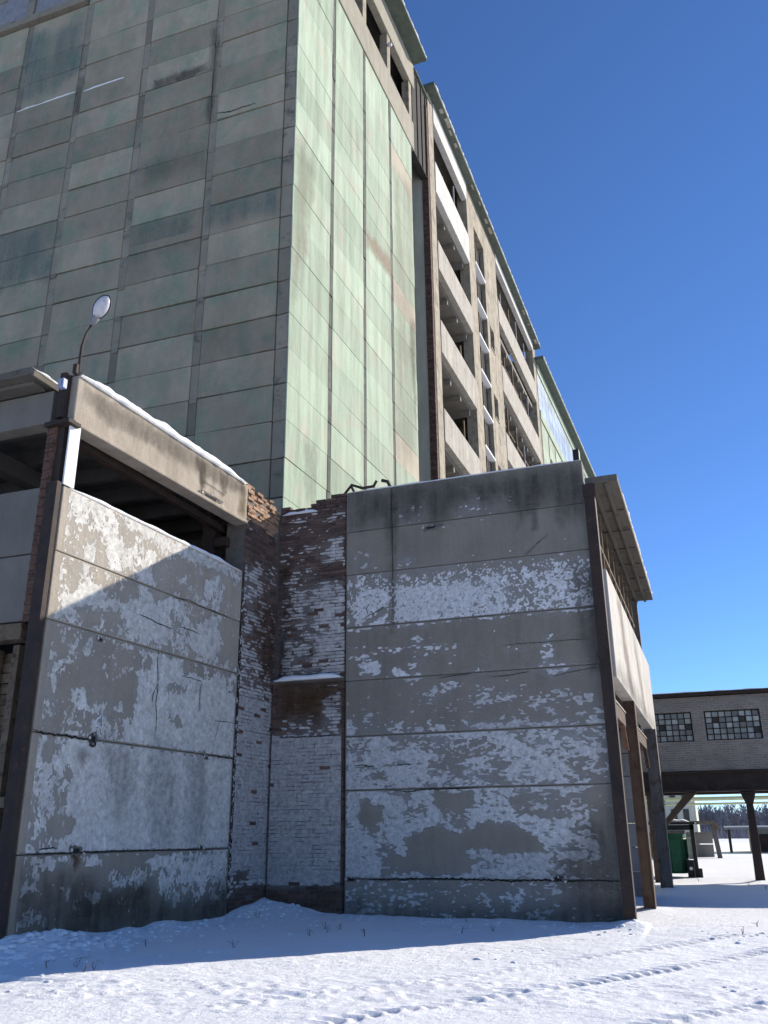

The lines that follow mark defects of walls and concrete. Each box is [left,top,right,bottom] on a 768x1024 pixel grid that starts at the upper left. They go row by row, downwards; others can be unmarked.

crack [141,598,235,760]
peeling [16,489,620,932]